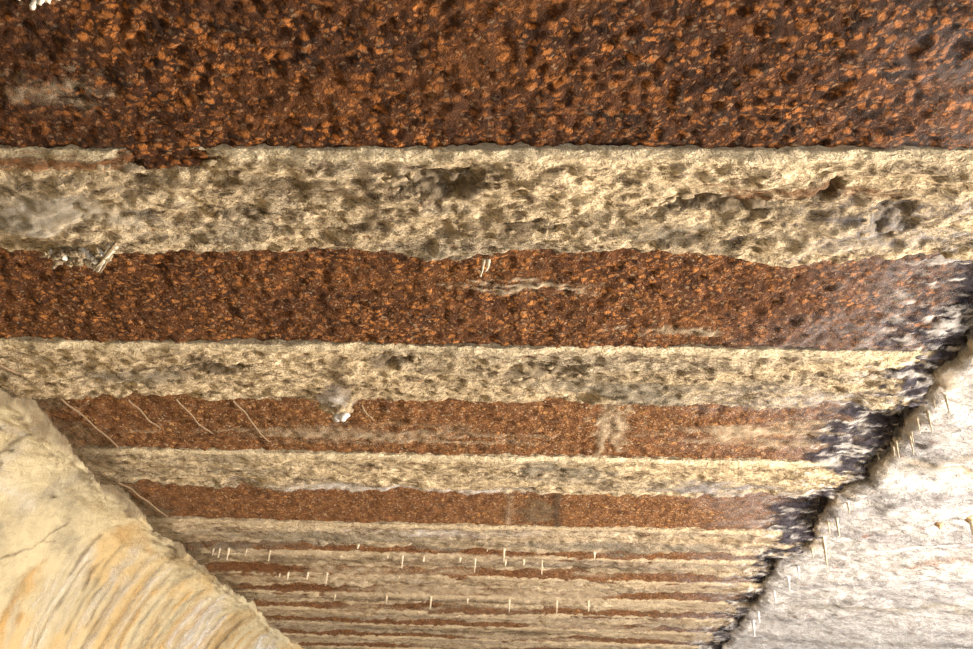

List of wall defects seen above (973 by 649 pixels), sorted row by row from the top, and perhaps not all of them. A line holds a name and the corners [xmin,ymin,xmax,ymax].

leakage [19,0,60,10]
rust [0,151,134,172]
leakage [697,249,973,649]
rust [468,546,534,561]
rust [205,562,335,597]
rust [432,607,542,617]